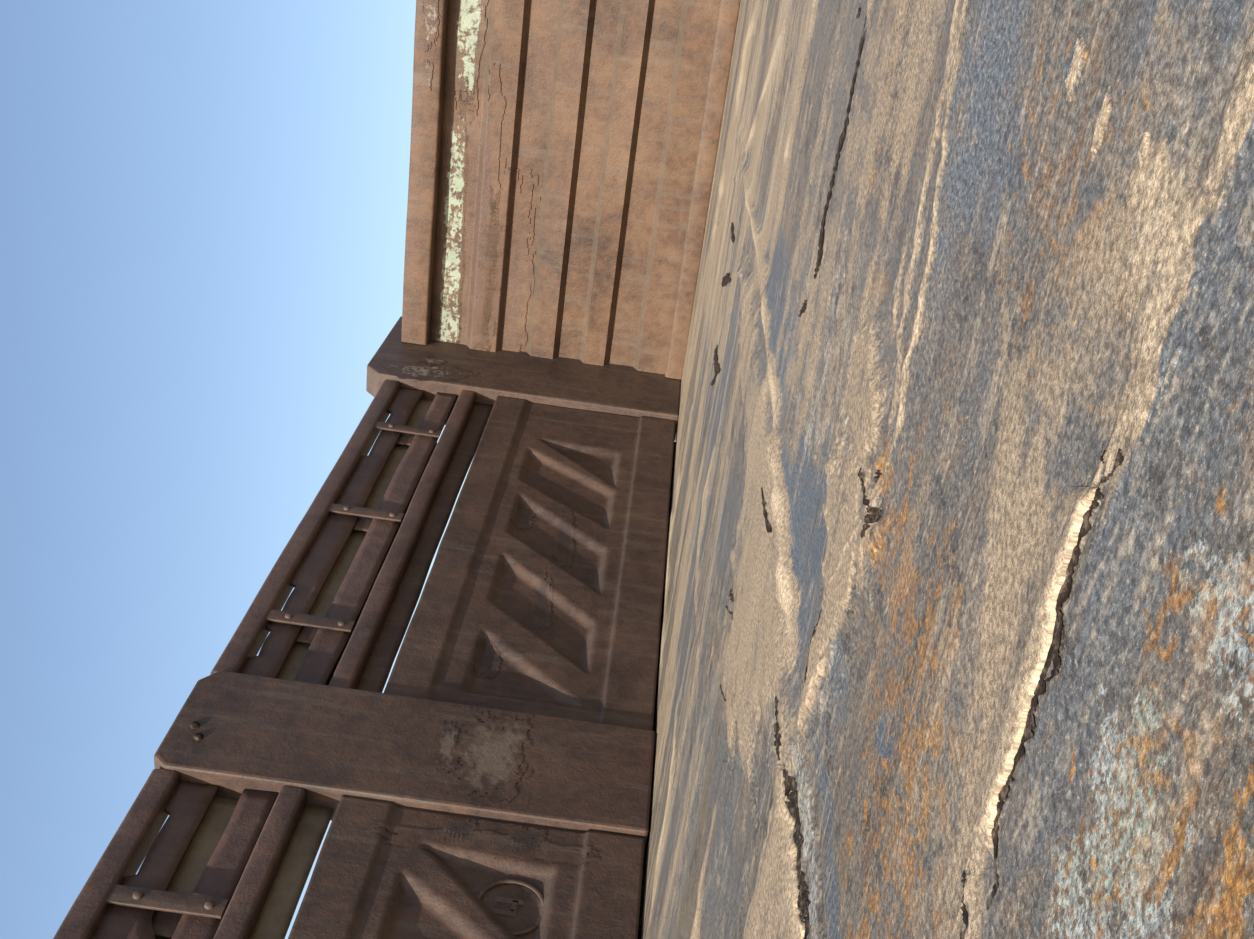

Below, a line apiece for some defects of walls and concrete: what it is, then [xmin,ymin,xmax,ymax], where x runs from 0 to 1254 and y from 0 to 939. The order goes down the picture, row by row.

peeling [422,0,439,91]
peeling [436,0,488,344]
crack [798,3,867,317]
peeling [381,356,477,382]
crack [761,488,772,533]
crack [765,610,821,939]
crack [960,448,1123,939]